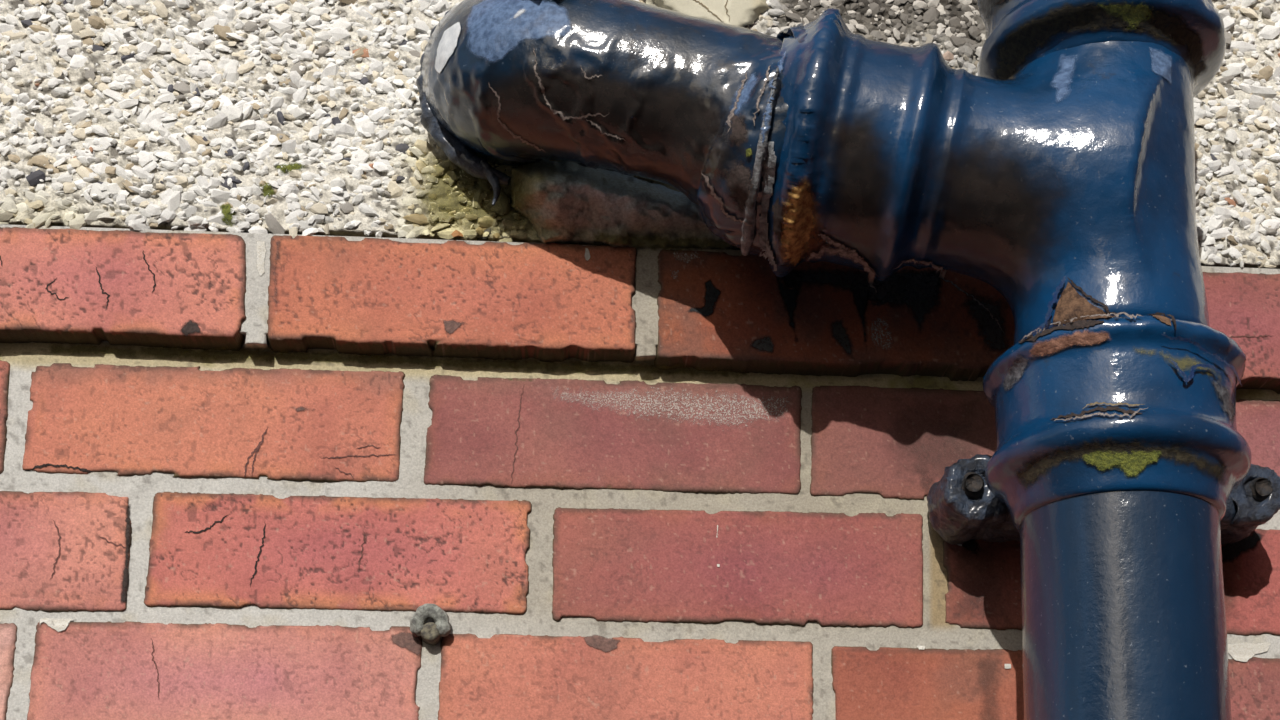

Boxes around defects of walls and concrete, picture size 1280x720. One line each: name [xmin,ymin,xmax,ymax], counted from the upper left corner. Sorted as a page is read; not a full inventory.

crack [695,0,757,28]
leakage [556,389,787,426]
crack [244,427,268,477]
crack [185,515,228,533]
crack [250,524,266,585]